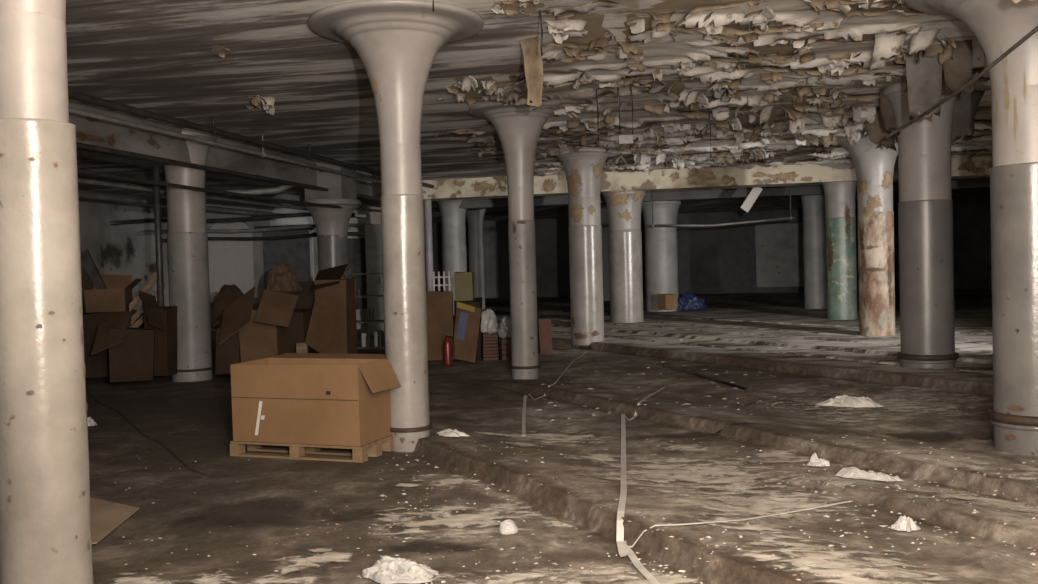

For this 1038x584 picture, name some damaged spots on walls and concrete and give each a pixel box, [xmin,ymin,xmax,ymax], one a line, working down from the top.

peeling [436,0,992,223]
rust [859,228,892,309]